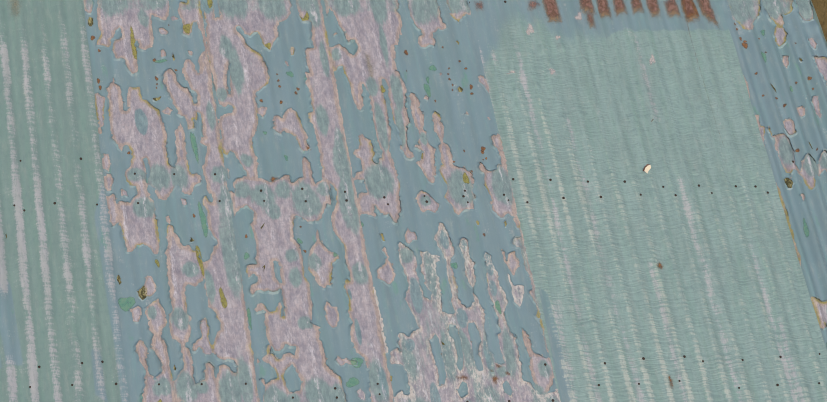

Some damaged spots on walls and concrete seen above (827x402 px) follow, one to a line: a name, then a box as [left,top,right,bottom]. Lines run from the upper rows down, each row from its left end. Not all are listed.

rust [529,0,561,22]
rust [580,0,716,27]
peeling [726,0,827,90]
peeling [83,0,561,402]
peeling [755,95,827,266]
peeling [811,296,827,330]